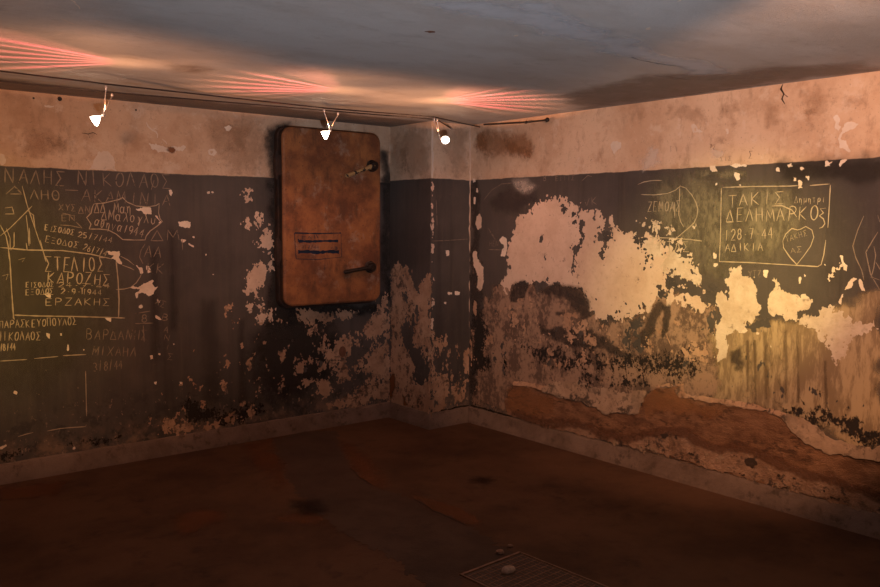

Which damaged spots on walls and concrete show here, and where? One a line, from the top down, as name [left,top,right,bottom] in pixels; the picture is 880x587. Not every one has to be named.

crack [627,55,788,104]
damp [478,131,531,155]
peeling [148,195,880,514]
damp [520,284,880,448]
damp [512,411,880,502]